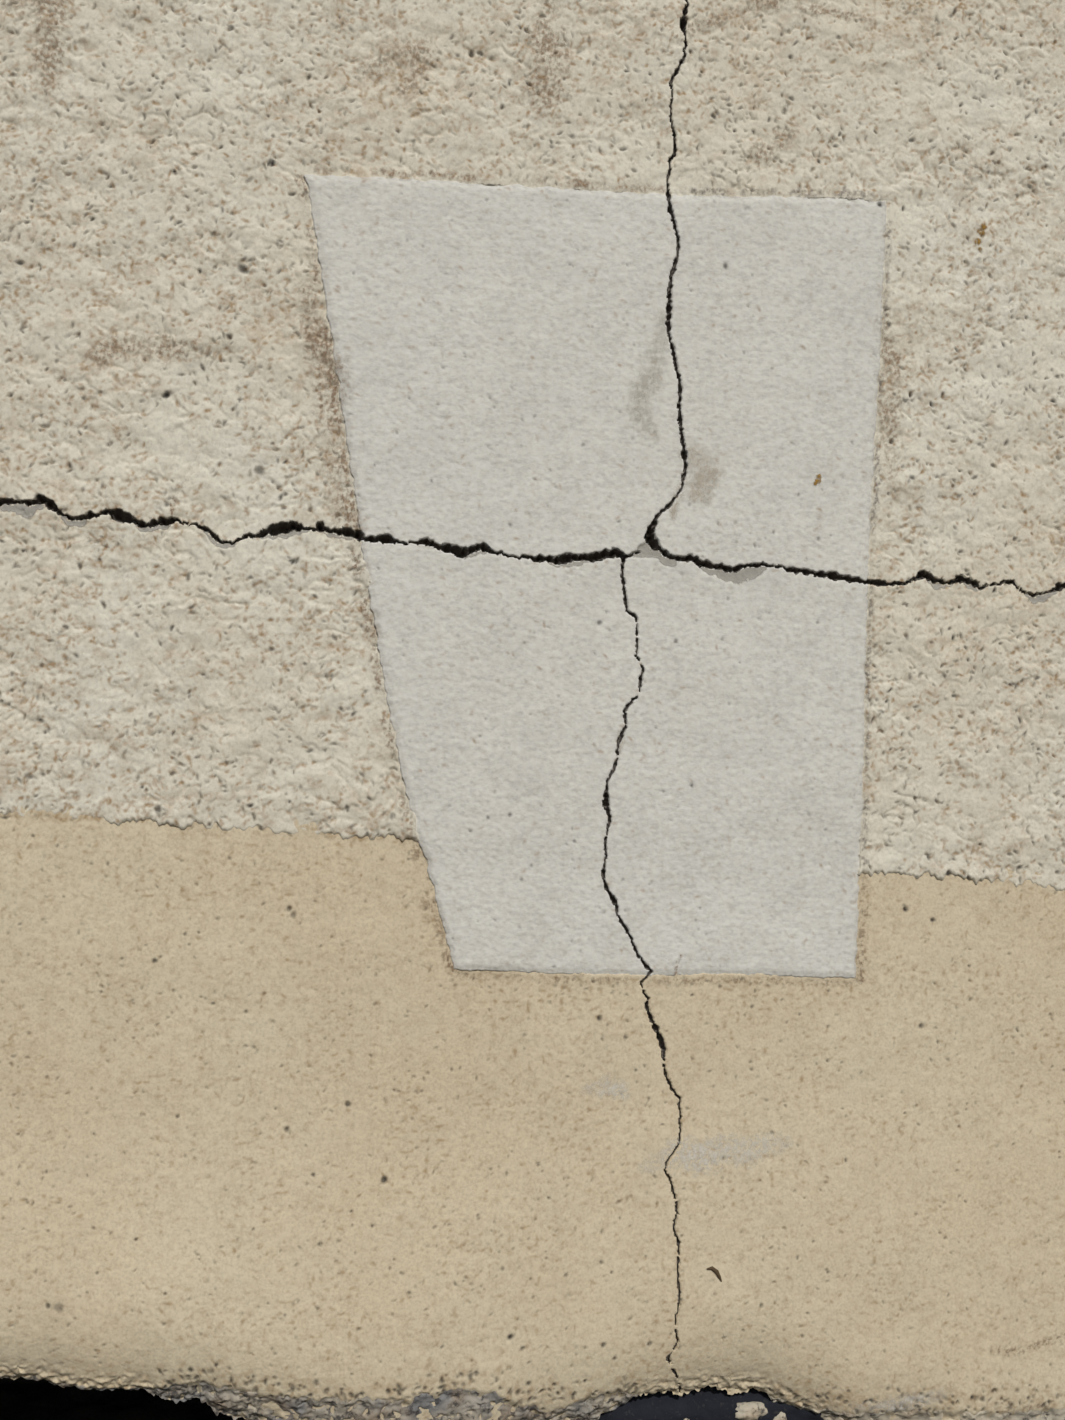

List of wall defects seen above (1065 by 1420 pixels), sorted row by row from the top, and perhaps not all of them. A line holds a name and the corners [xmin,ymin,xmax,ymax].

crack [0,0,1065,692]
crack [601,697,681,1392]
spalling [0,1374,638,1420]
spalling [735,1395,1065,1420]